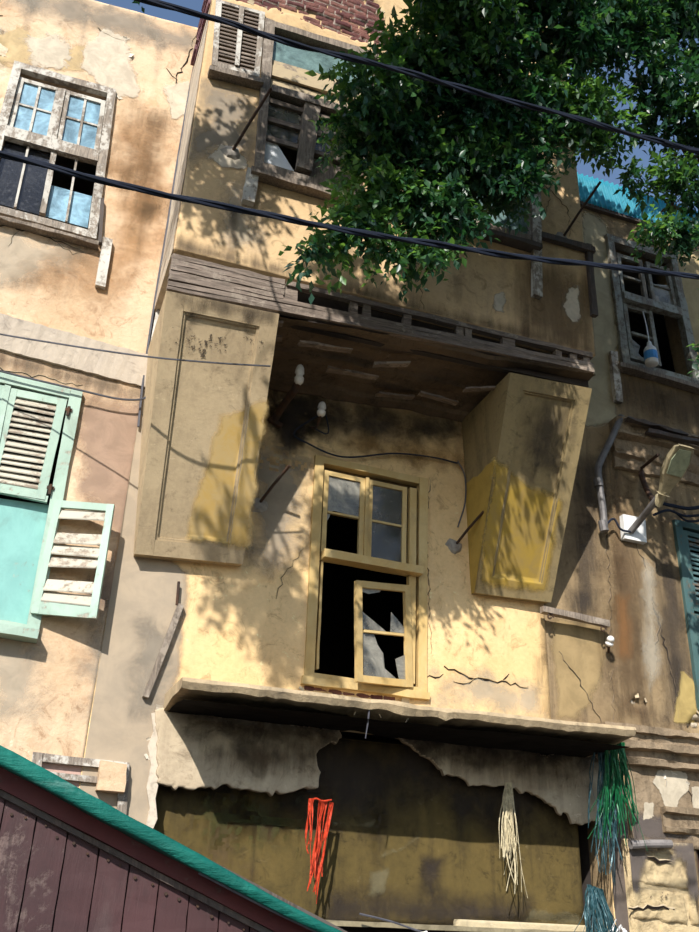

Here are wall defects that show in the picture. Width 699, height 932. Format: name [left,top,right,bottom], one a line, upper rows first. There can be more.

peeling [0,26,140,99]
spalling [236,0,390,45]
peeling [582,213,619,426]
peeling [188,402,305,566]
crack [276,548,304,599]
crack [427,567,528,688]
crack [559,532,615,722]
crack [650,596,678,709]
peeling [643,769,699,820]
flaking render [607,784,630,932]
crack [628,903,675,911]
crack [647,856,672,864]